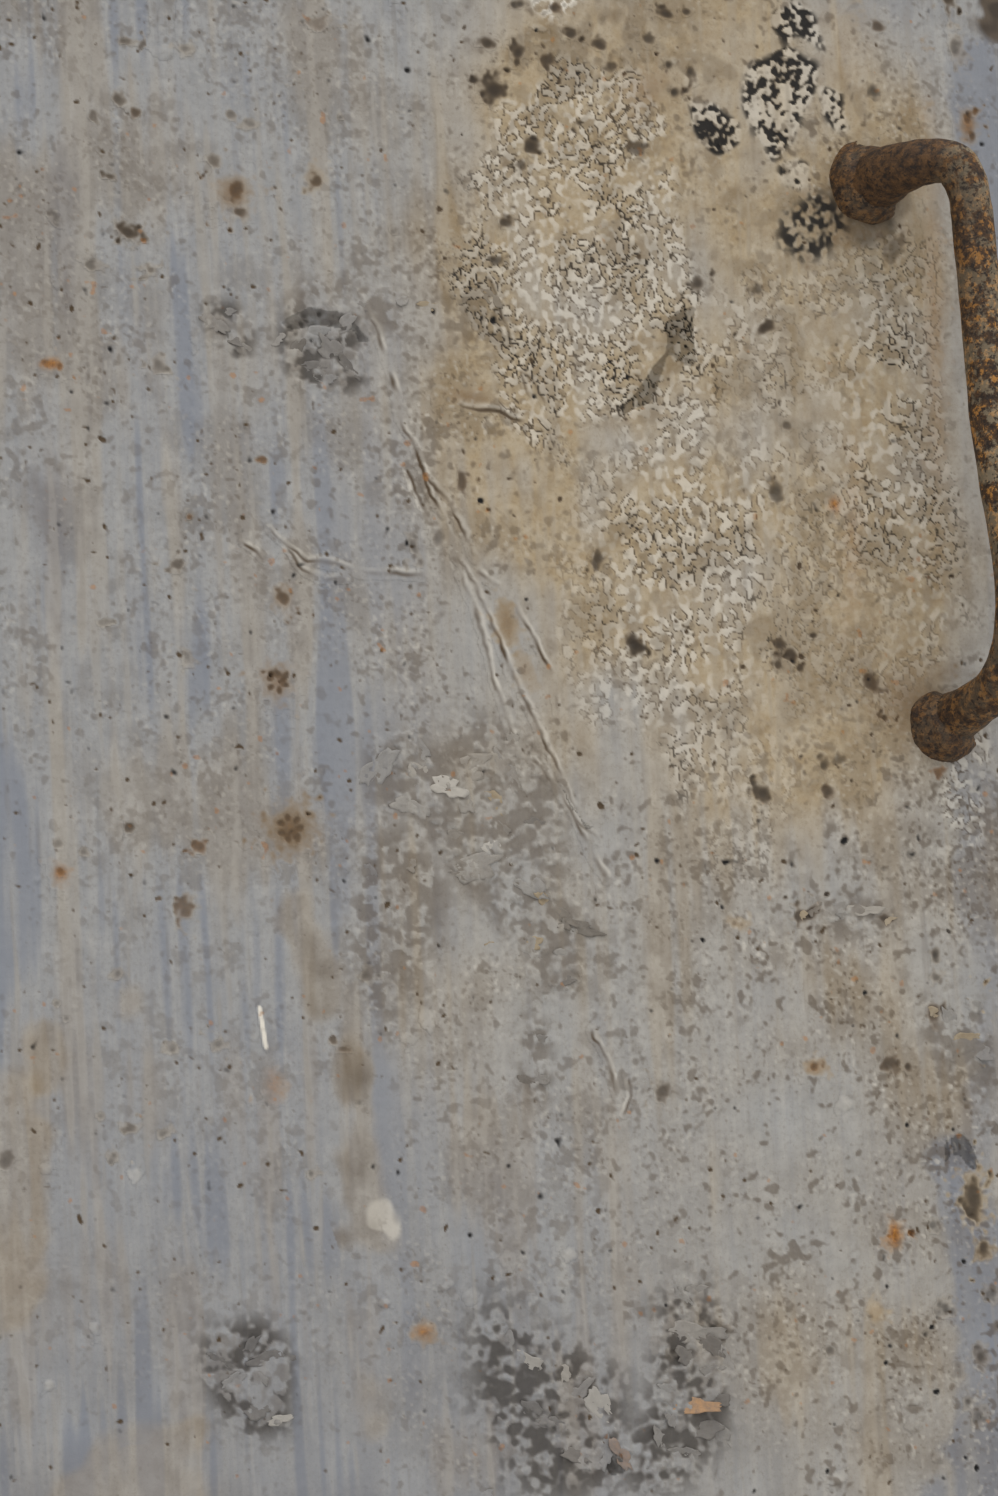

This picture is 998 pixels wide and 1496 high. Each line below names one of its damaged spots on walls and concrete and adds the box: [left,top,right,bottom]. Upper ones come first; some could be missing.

crack [237,58,791,886]
rust [782,0,990,530]
crack [834,234,960,661]
rust [829,414,980,764]